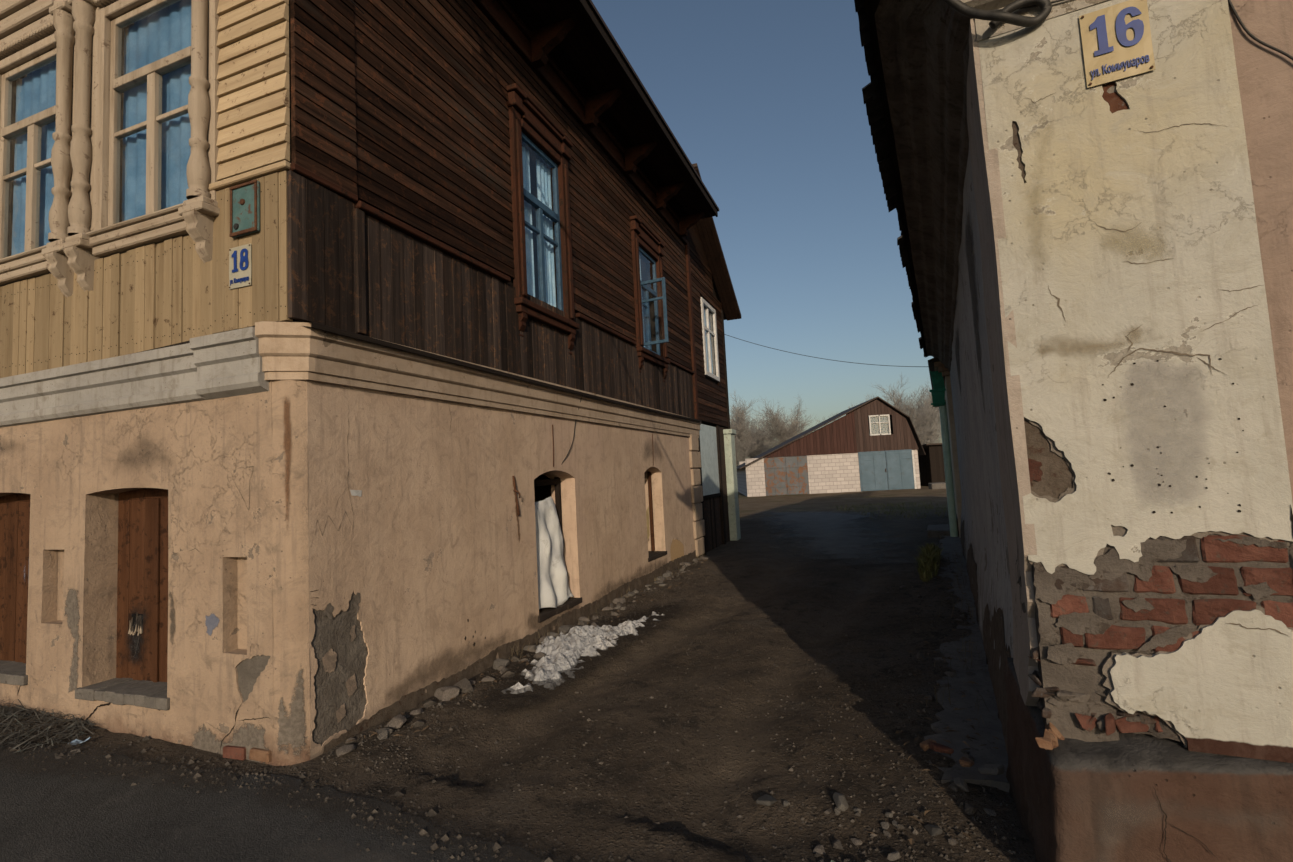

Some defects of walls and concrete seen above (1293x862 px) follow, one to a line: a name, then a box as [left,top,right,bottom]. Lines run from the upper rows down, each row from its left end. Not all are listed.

crack [1140,123,1227,133]
crack [1096,222,1174,264]
crack [1109,285,1263,376]
flaking render [1015,419,1074,499]
flaking render [236,655,271,702]
flaking render [311,550,701,754]
flaking render [960,520,1011,754]
flaking render [1017,534,1293,750]
crack [205,703,270,750]